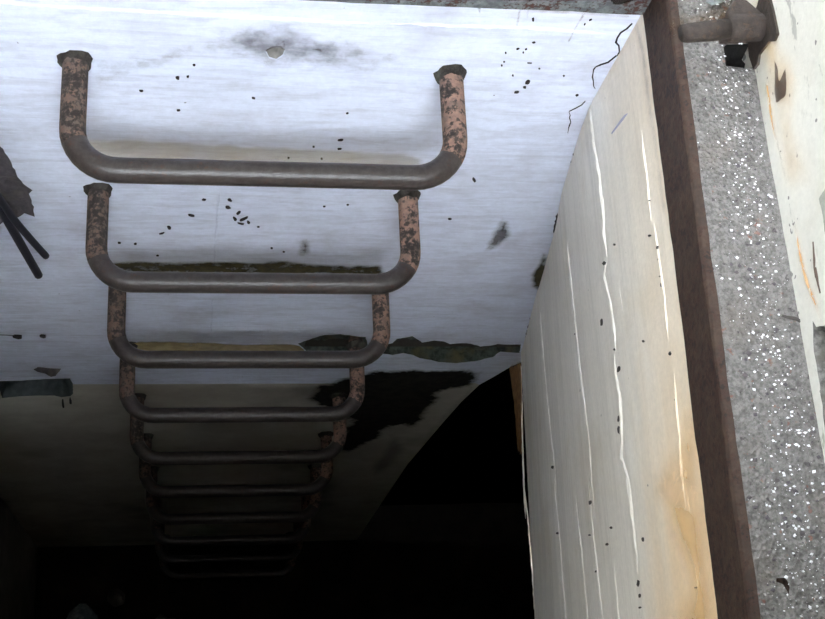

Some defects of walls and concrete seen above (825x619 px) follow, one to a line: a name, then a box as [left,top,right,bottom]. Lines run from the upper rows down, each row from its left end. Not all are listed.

spalling [298,334,349,351]
spalling [383,336,521,363]